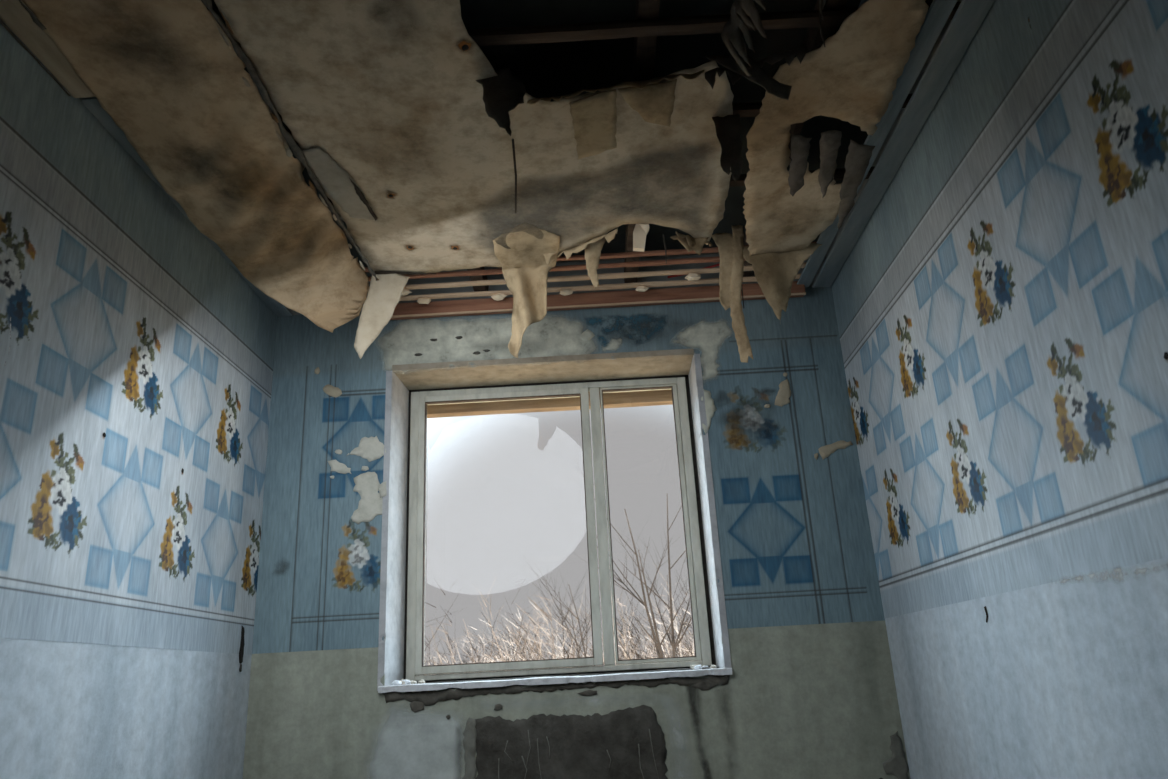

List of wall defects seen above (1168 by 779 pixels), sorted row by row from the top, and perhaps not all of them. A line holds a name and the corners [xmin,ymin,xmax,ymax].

crack [201,0,436,281]
peeling [701,389,717,434]
spalling [382,675,730,779]